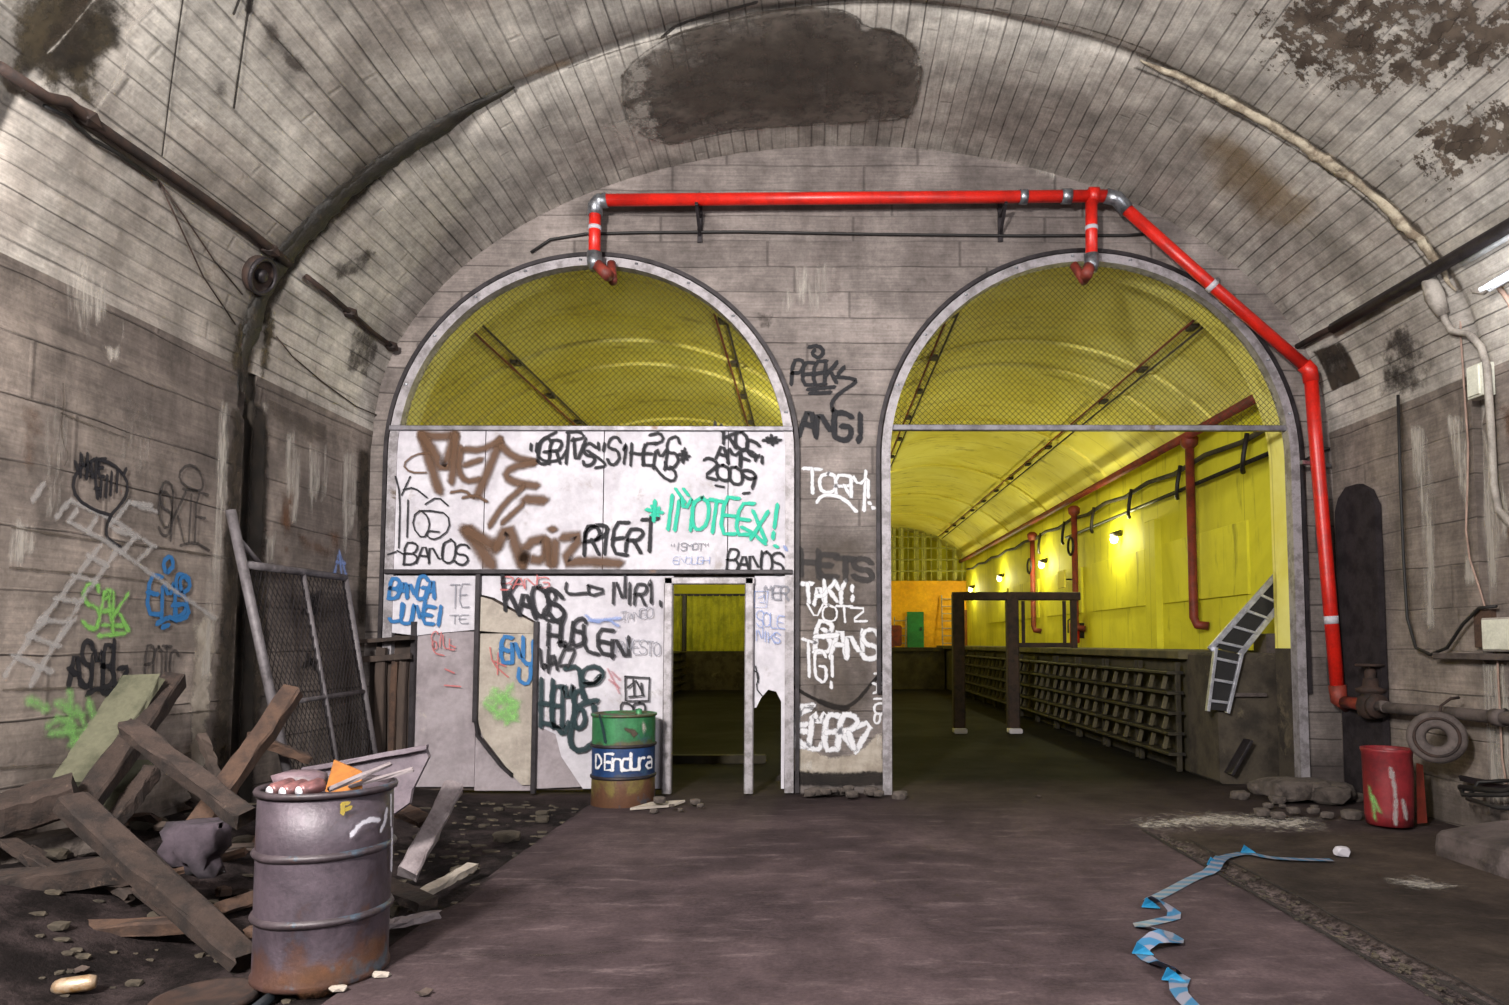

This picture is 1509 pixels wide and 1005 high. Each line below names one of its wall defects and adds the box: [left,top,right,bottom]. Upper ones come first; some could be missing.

damp [14,0,156,103]
spalling [611,7,924,145]
peeling [1234,0,1509,202]